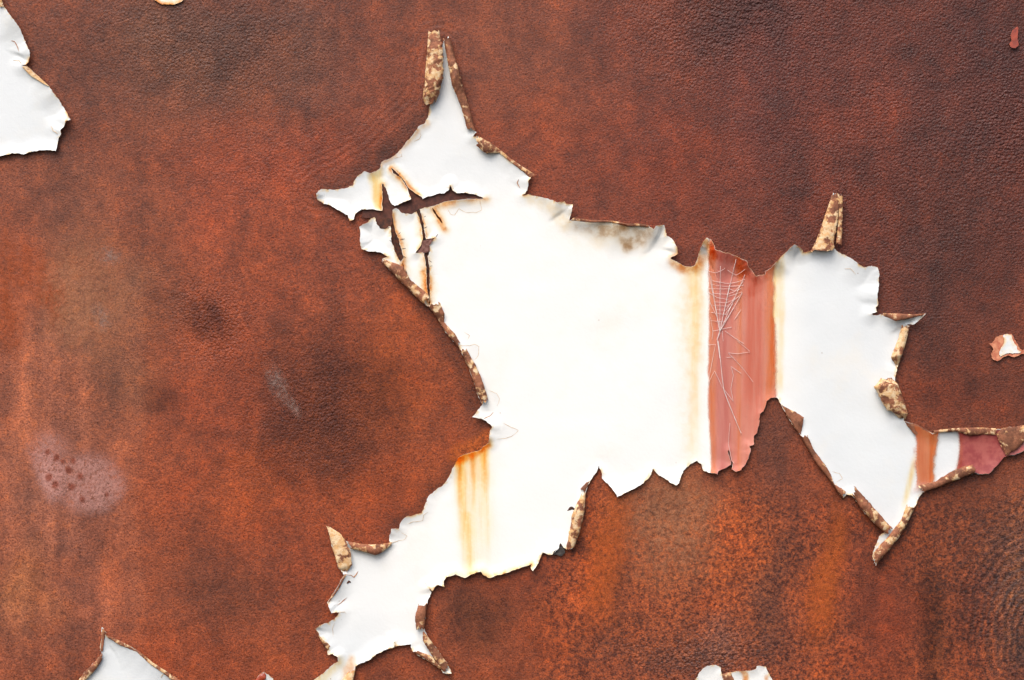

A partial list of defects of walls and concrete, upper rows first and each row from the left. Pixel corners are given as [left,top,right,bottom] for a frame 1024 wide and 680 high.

peeling [0,0,71,156]
peeling [314,30,1024,680]
rust [708,239,776,474]
rust [915,425,938,485]
rust [956,430,1024,474]
peeling [79,627,179,680]